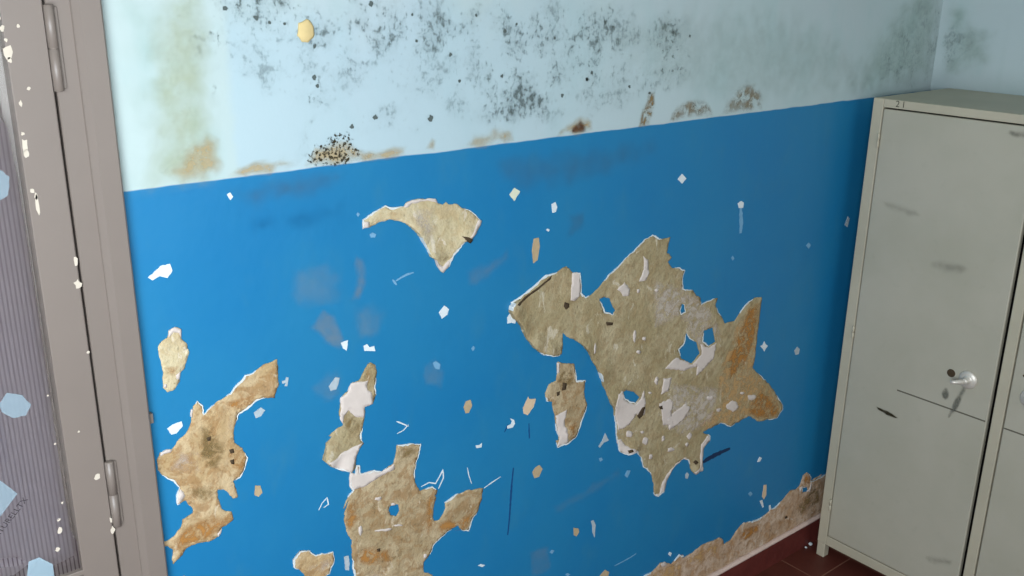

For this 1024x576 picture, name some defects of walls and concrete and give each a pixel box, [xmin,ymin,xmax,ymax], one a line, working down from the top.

water stain [308,124,397,165]
peeling [356,198,482,273]
peeling [532,229,549,263]
peeling [158,327,189,392]
peeling [507,235,783,497]
peeling [157,359,288,564]
peeling [292,344,483,576]
spalling [644,472,826,576]